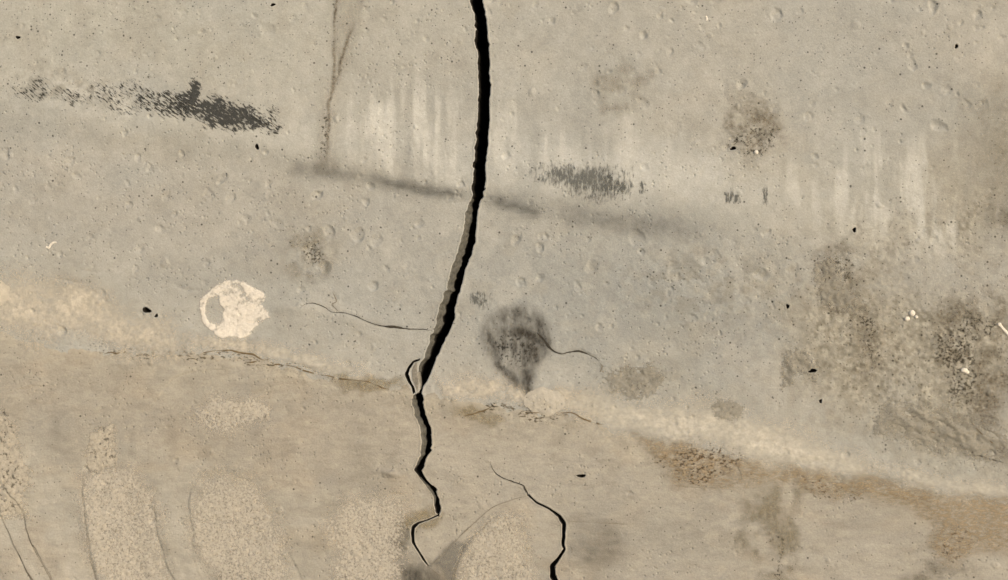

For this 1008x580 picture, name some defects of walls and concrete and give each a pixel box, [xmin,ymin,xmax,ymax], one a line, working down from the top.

leakage [144,77,201,121]
crack [79,0,620,580]
leakage [903,470,1008,496]